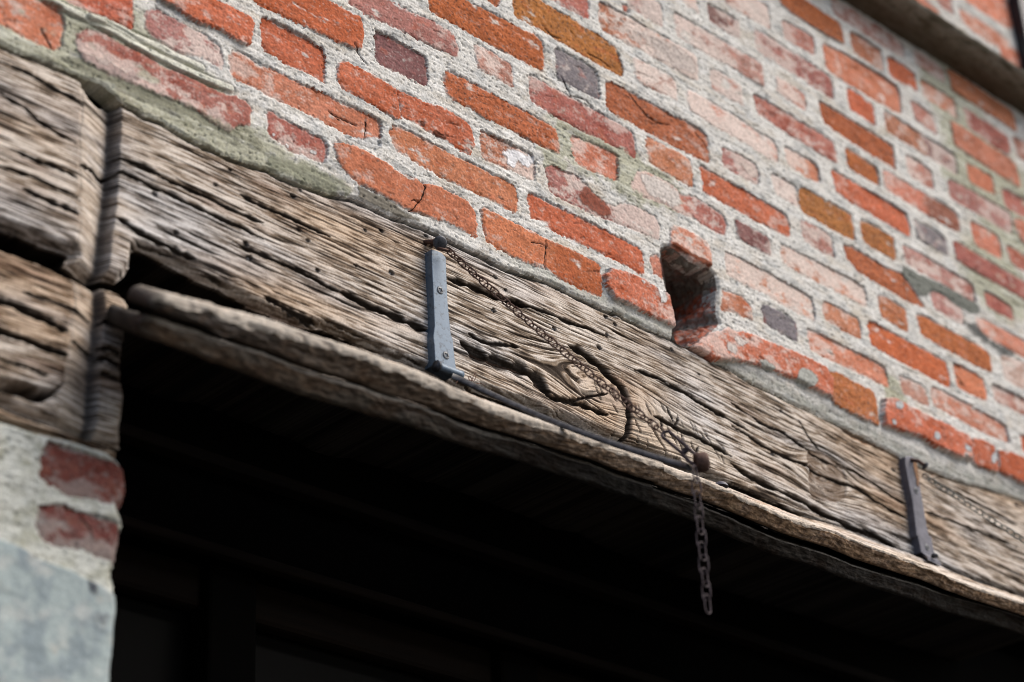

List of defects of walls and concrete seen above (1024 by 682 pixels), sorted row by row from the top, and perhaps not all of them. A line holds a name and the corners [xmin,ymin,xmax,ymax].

spalling [659,242,718,350]